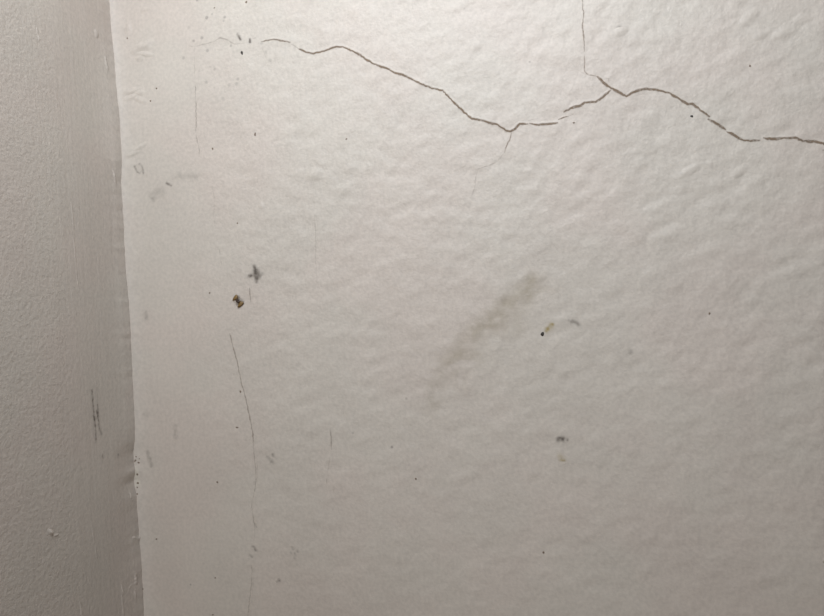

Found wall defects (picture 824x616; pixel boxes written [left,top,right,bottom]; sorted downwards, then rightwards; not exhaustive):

crack [261,37,824,147]